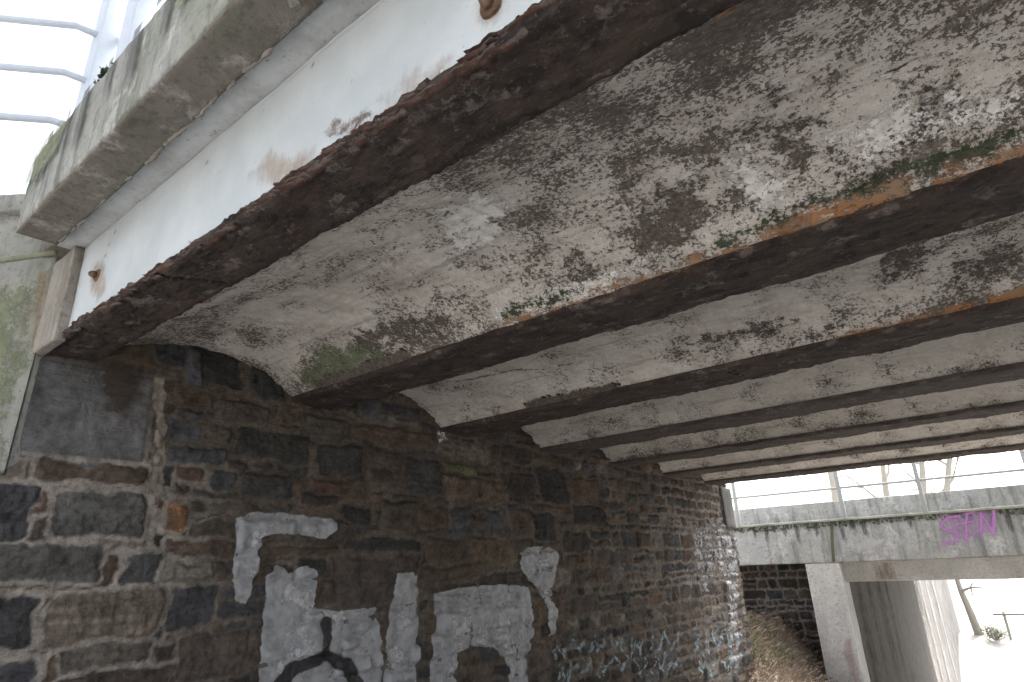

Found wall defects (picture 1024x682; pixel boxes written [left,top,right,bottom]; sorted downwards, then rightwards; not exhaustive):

peeling [61,171,302,340]
water stain [117,23,297,188]
peeling [315,0,557,160]
rust [681,176,912,267]
rust [932,144,1024,185]
peeling [319,304,464,388]